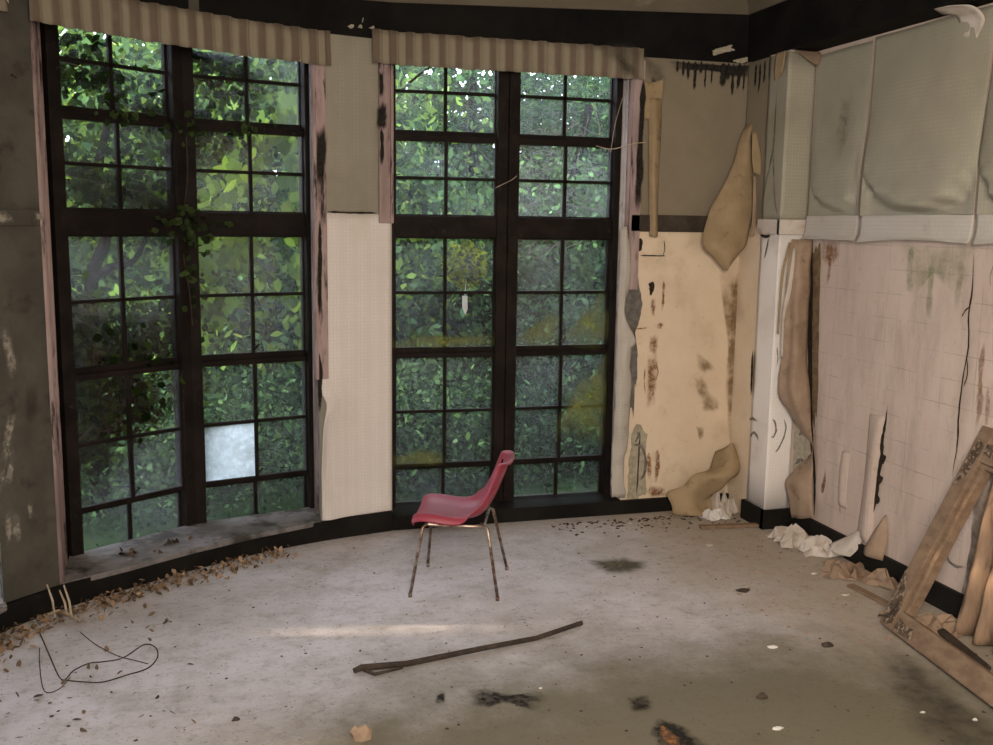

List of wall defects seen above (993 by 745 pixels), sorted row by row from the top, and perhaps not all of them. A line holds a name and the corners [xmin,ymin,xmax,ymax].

water stain [676,60,770,94]
water stain [724,285,737,362]
crack [952,262,974,475]